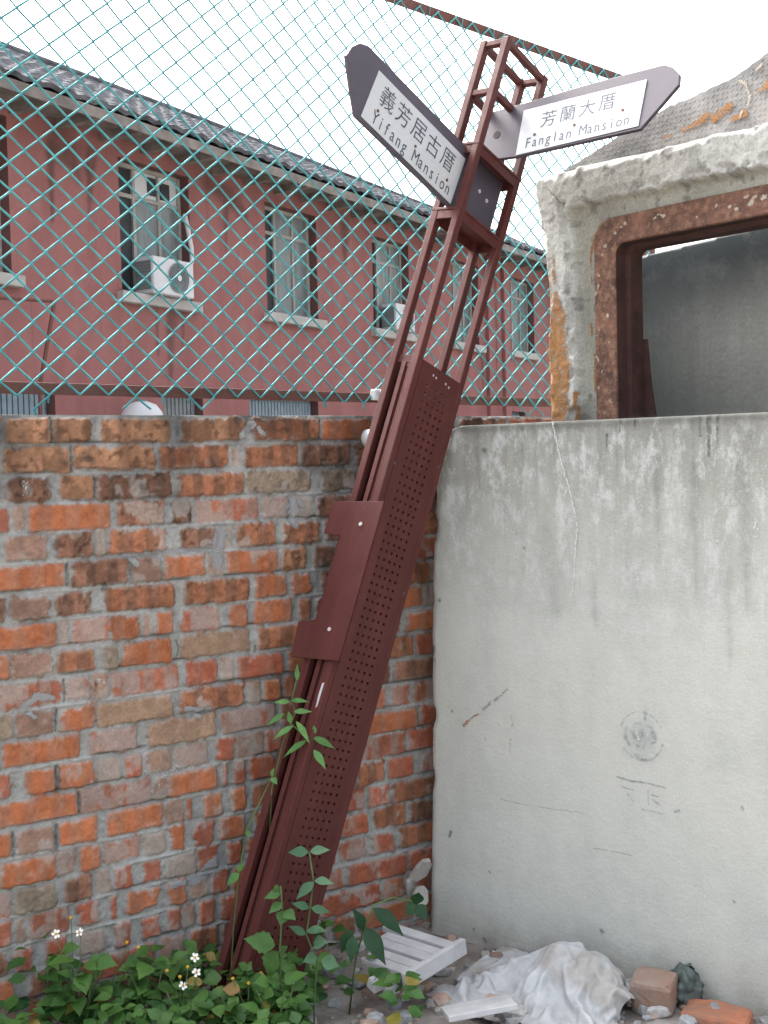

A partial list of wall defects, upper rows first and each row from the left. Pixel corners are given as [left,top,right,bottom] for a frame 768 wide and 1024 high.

rust [664,101,748,139]
rust [546,253,583,422]
crack [552,422,581,598]